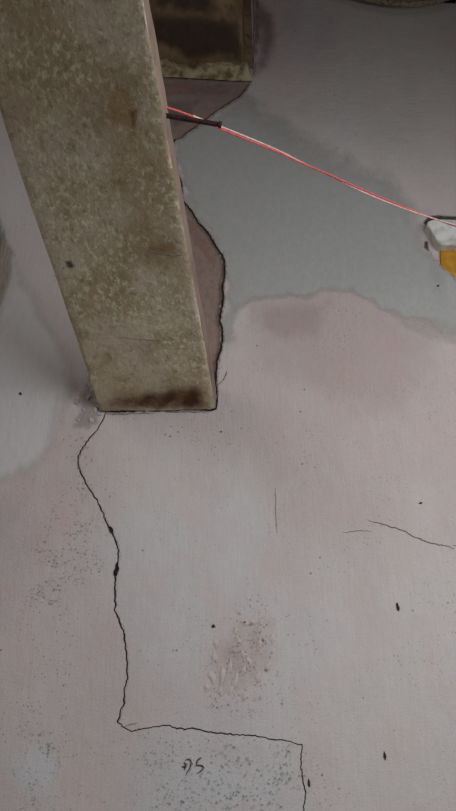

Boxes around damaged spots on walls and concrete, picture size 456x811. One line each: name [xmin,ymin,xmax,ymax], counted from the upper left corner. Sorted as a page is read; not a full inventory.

flaking render [163,77,250,141]
flaking render [185,206,224,379]
crack [78,412,306,811]
crack [342,521,456,549]